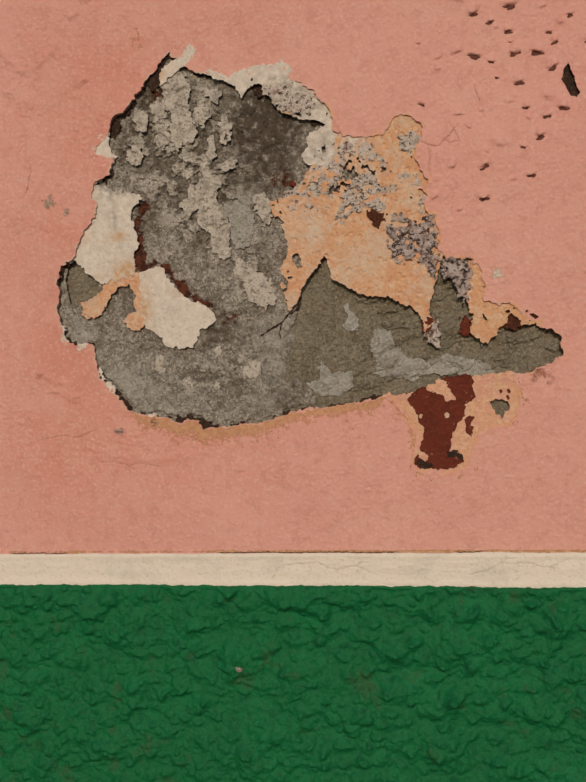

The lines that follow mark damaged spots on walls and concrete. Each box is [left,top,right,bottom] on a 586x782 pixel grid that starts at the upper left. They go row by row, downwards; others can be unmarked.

peeling [561,64,580,97]
flaking render [58,44,564,473]
crack [218,551,399,577]